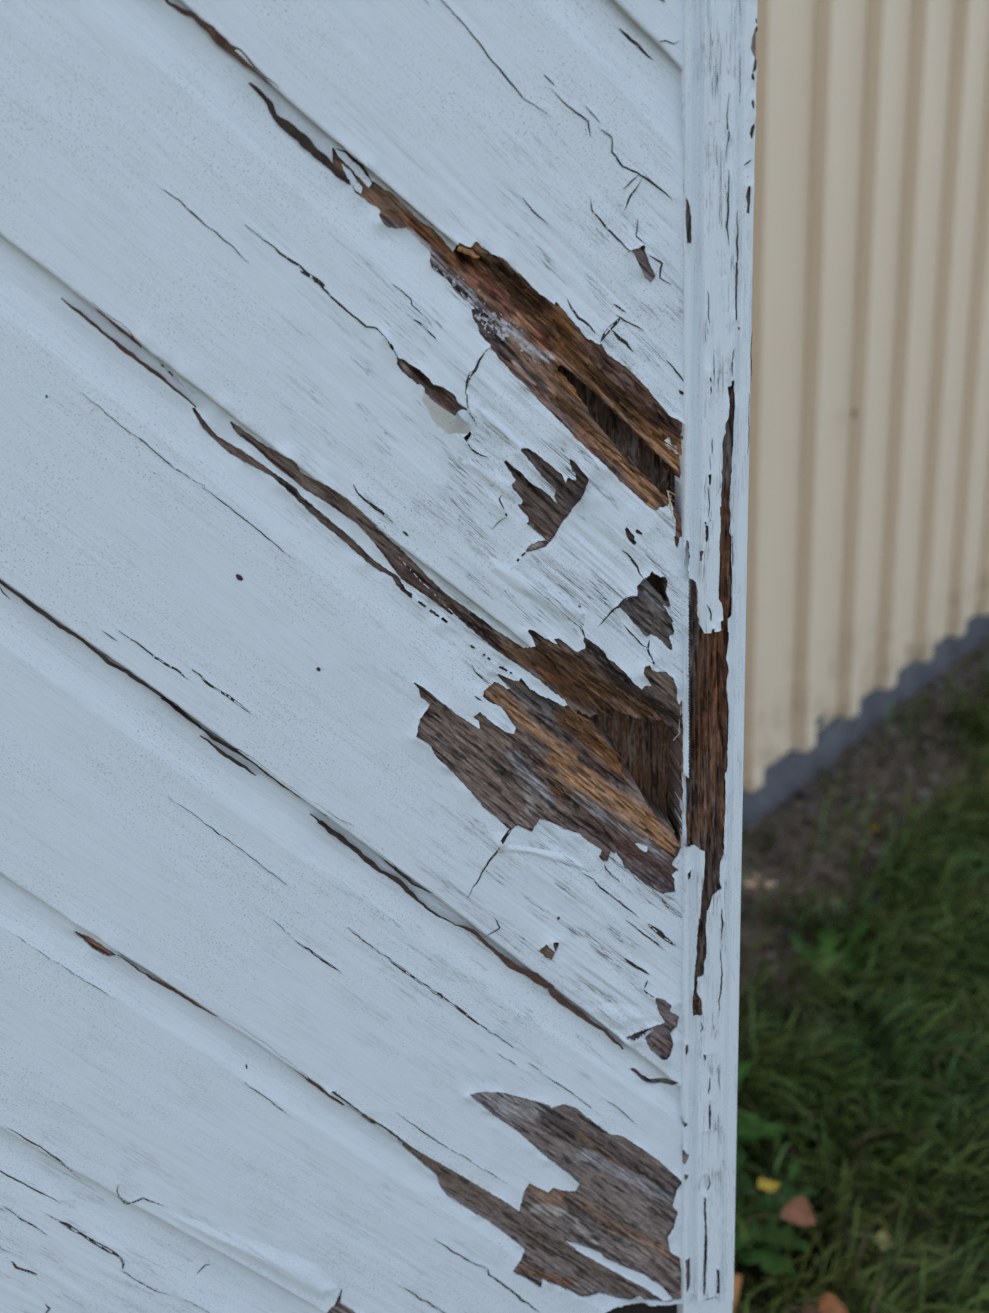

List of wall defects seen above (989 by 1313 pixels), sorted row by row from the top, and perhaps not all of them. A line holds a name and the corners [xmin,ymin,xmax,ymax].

crack [426,0,679,284]
peeling [632,245,655,282]
crack [567,299,642,352]
peeling [390,344,471,434]
crack [666,360,684,395]
spalling [192,408,691,894]
peeling [333,1091,720,1301]